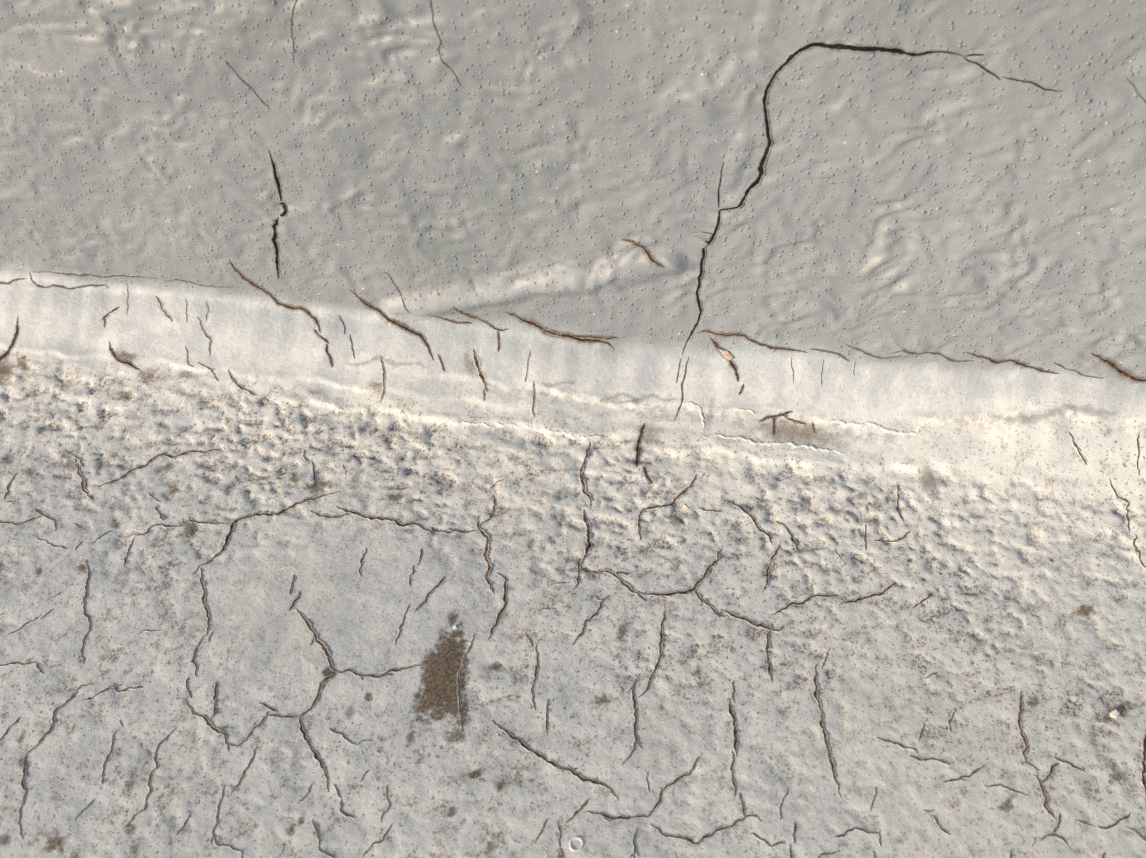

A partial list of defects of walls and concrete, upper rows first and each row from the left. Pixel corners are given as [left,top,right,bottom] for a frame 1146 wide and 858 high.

crack [0,150,618,418]
crack [621,239,665,268]
crack [674,40,1146,420]
crack [0,449,508,858]
crack [490,423,895,858]
crack [760,411,815,435]
crack [834,485,910,565]
crack [912,593,959,613]
crack [1068,432,1146,569]
crack [877,691,1146,858]